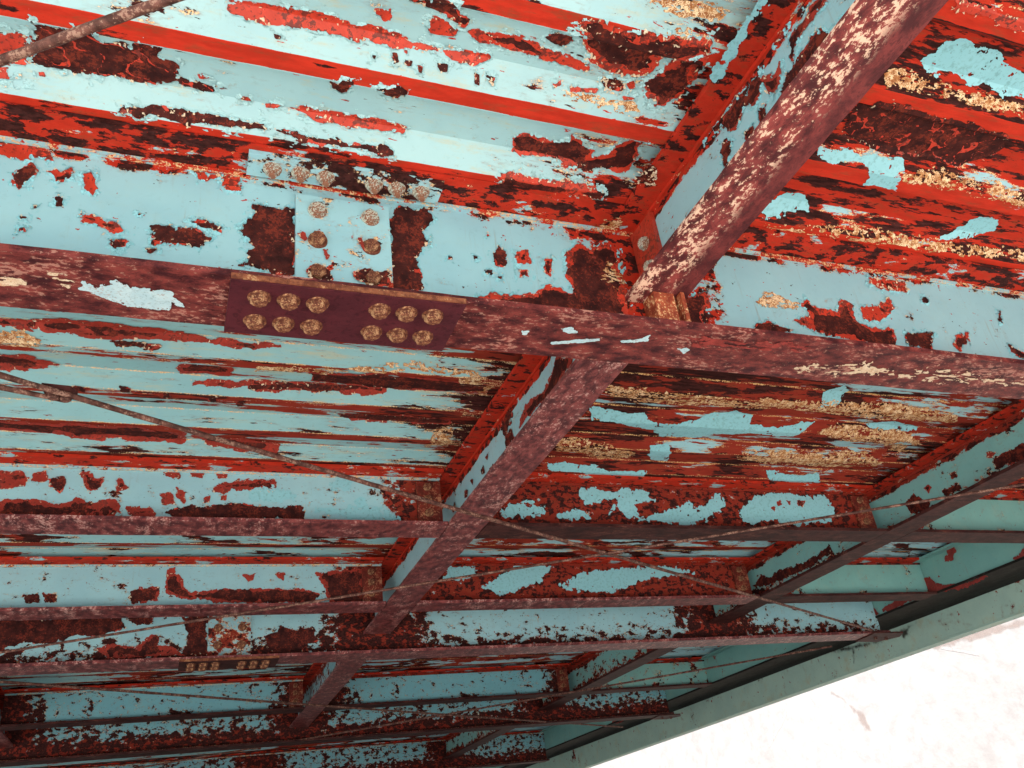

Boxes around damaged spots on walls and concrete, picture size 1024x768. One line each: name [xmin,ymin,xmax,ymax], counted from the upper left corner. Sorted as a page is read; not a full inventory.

corrosion [21,14,397,164]
peeling [221,0,770,118]
peeling [921,38,1024,99]
corrosion [842,68,1024,207]
corrosion [101,200,334,281]
corrosion [353,203,456,291]
corrosion [767,224,1024,262]
peeling [48,272,184,311]
peeling [677,273,1024,408]
peeling [0,470,297,516]
corrosion [162,502,305,519]
peeling [500,406,815,525]